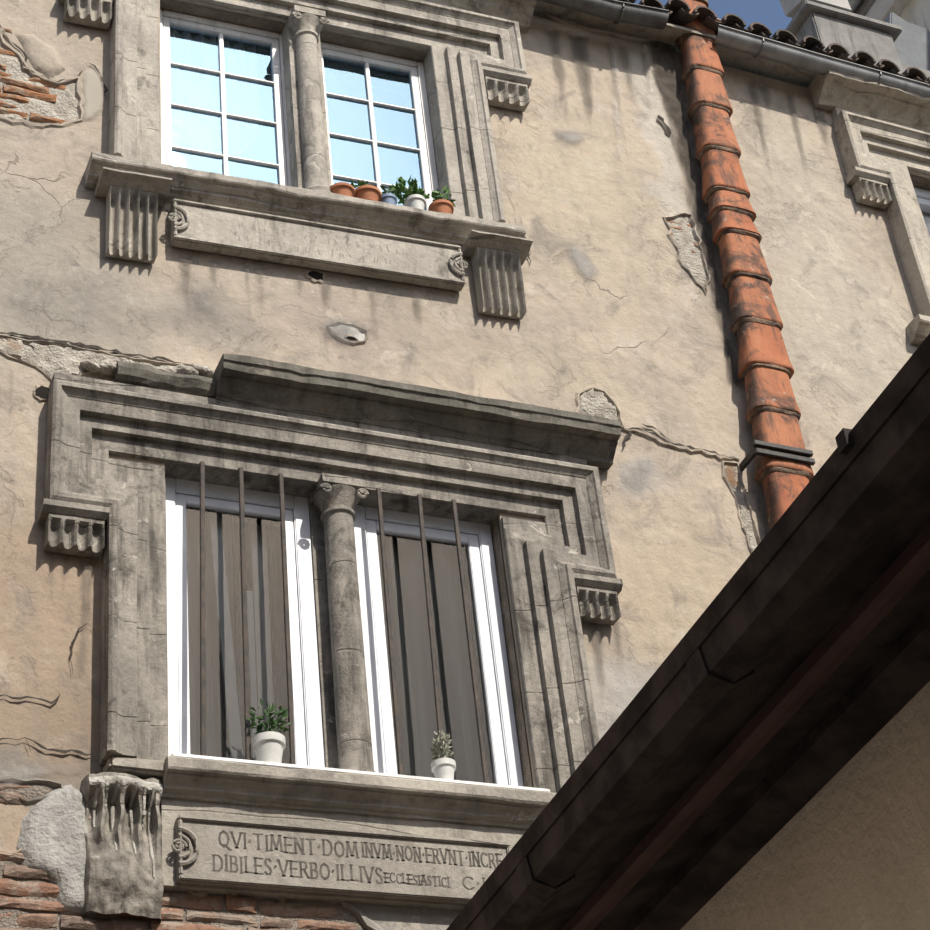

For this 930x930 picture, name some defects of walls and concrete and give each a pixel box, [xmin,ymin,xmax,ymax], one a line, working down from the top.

flaking render [0,27,86,129]
flaking render [662,213,711,296]
flaking render [0,334,190,403]
flaking render [573,385,625,430]
crack [70,624,96,675]
crack [0,695,60,704]
crack [0,737,94,756]
flaking render [0,849,384,930]